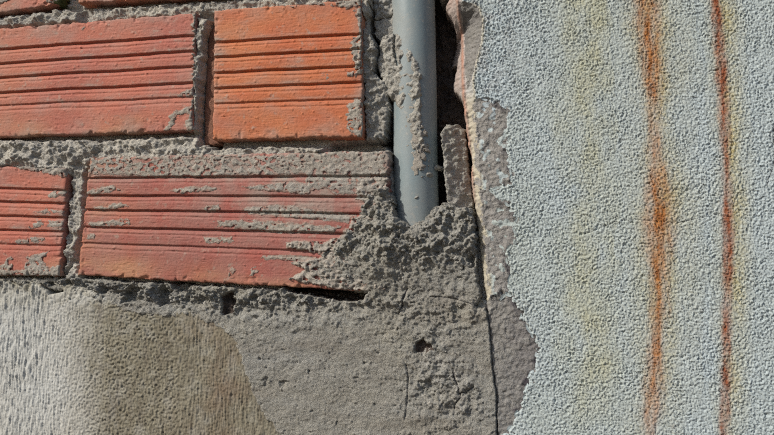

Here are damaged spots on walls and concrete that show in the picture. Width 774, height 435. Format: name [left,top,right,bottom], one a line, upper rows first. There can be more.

flaking render [460,1,482,88]
peeling [472,98,540,435]
rust [607,0,757,435]
water stain [51,295,279,435]
spalling [417,348,474,415]